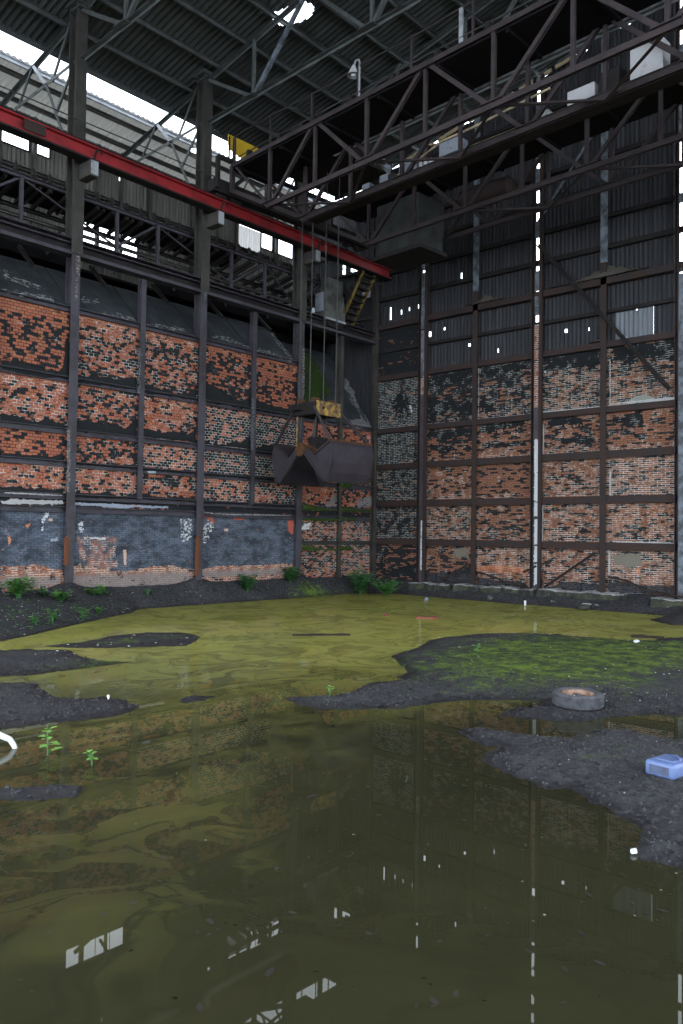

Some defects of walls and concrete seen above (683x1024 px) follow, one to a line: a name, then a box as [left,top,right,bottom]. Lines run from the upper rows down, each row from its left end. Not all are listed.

spalling [0,522,293,589]
peeling [288,520,312,535]